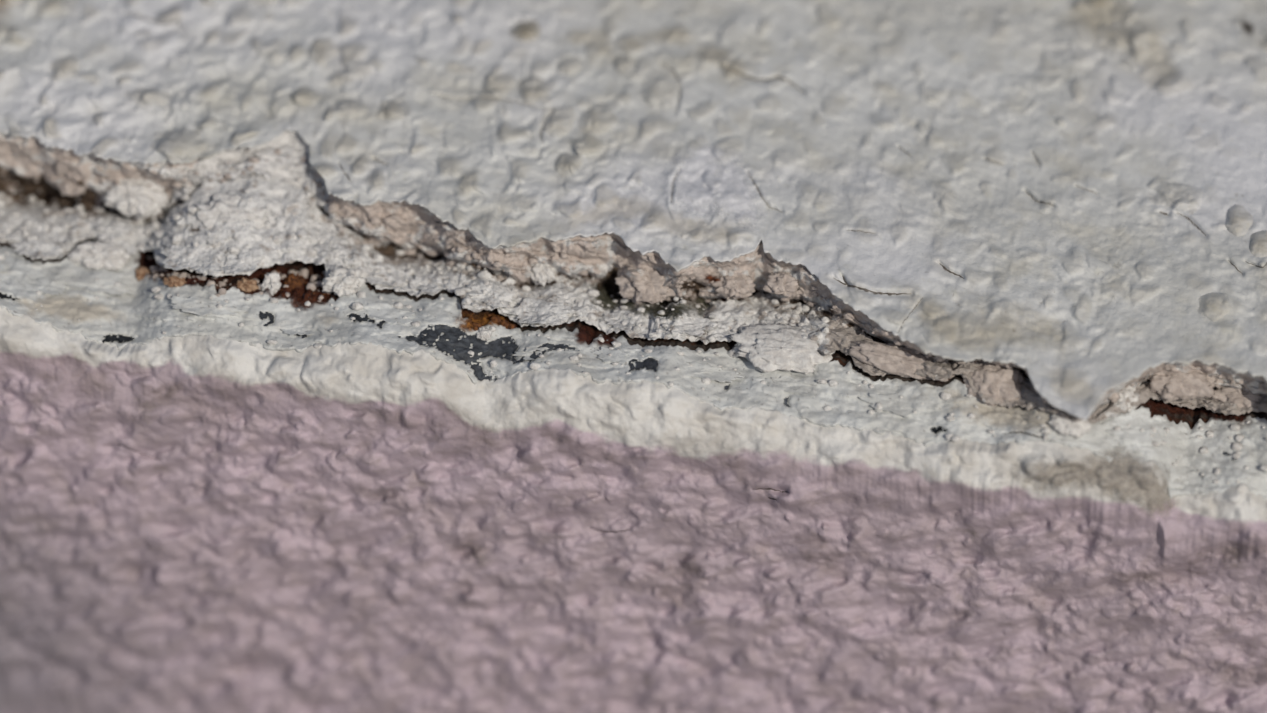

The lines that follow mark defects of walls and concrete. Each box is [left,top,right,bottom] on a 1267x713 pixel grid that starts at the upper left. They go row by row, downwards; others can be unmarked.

crack [0,239,102,264]
rust [135,251,330,310]
crack [365,275,462,305]
rust [461,314,518,341]
rust [576,326,616,347]
crack [518,324,737,351]
spalling [0,130,1267,511]
crack [833,356,964,387]